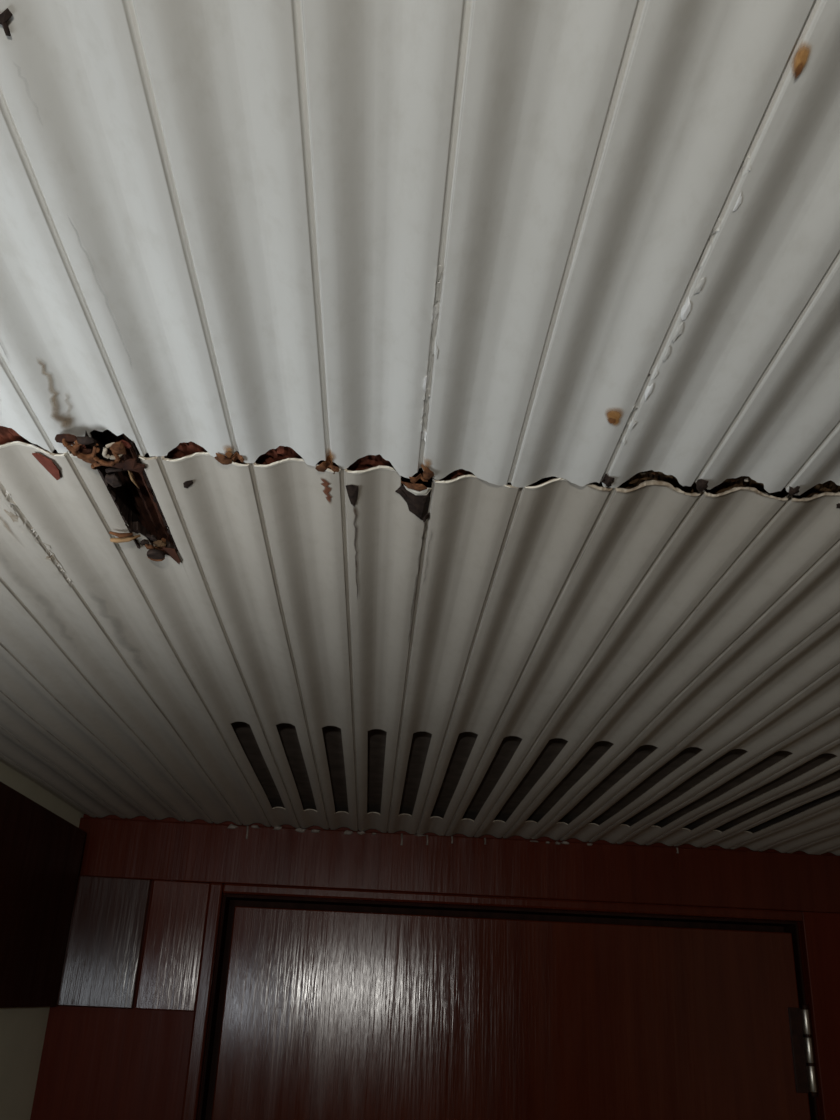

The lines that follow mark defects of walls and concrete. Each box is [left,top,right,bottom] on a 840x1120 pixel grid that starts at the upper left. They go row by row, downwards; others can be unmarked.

spalling [0,8,13,36]
rust [793,46,810,78]
rust [606,410,621,425]
crack [0,426,86,480]
peeling [55,434,98,464]
crack [119,440,477,484]
peeling [395,468,433,523]
crack [504,470,840,502]
peeling [140,539,169,556]